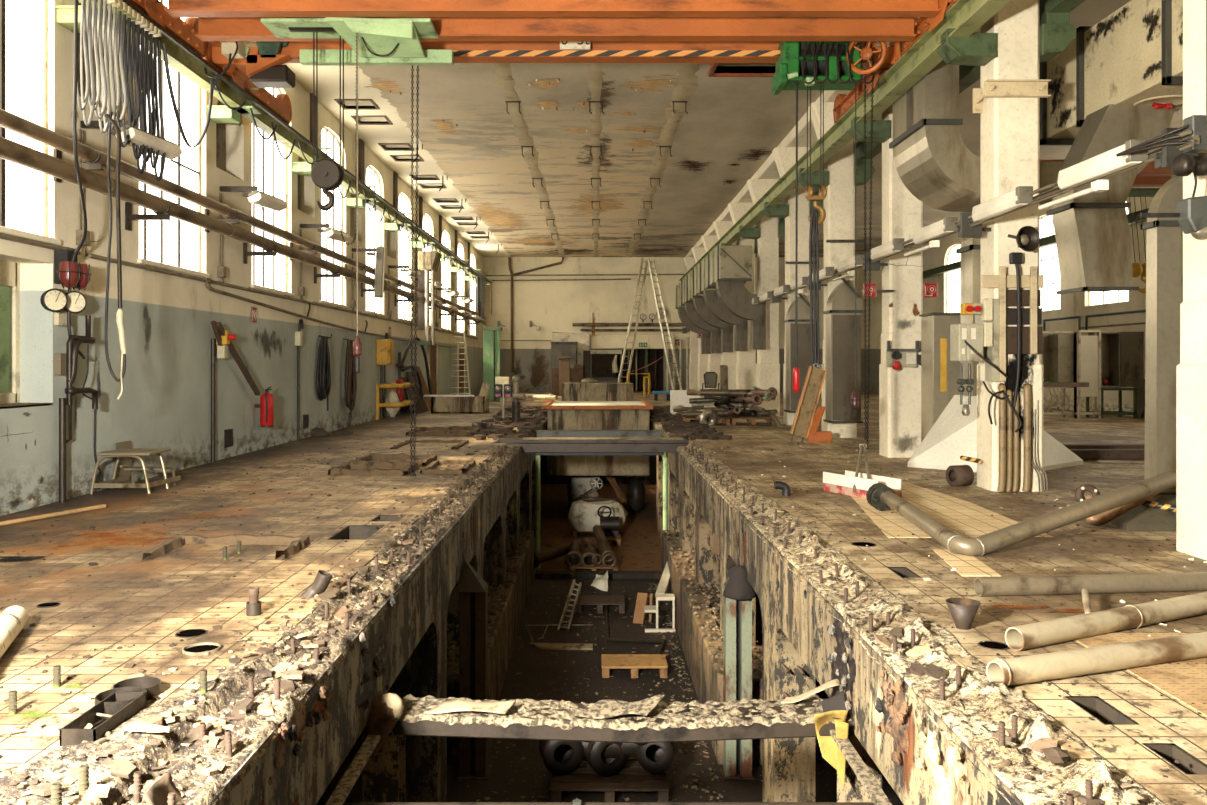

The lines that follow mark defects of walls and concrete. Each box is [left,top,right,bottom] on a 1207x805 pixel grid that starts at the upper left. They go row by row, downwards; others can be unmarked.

leakage [1086,7,1160,42]
leakage [1048,67,1076,127]
leakage [1143,61,1162,80]
leakage [255,332,281,354]
leakage [1004,354,1037,439]
spalling [208,414,547,805]
spalling [656,447,1024,805]
leakage [869,683,883,757]